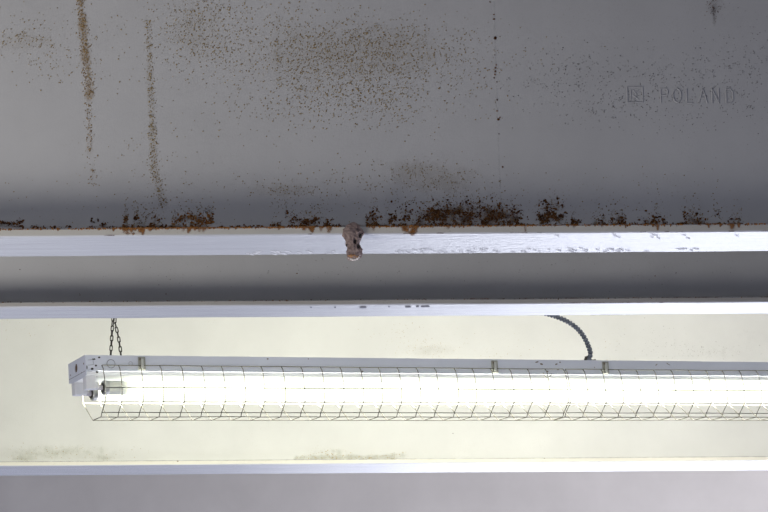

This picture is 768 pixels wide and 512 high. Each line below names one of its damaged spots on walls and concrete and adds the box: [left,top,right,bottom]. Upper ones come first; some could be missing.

rust [0,0,768,236]